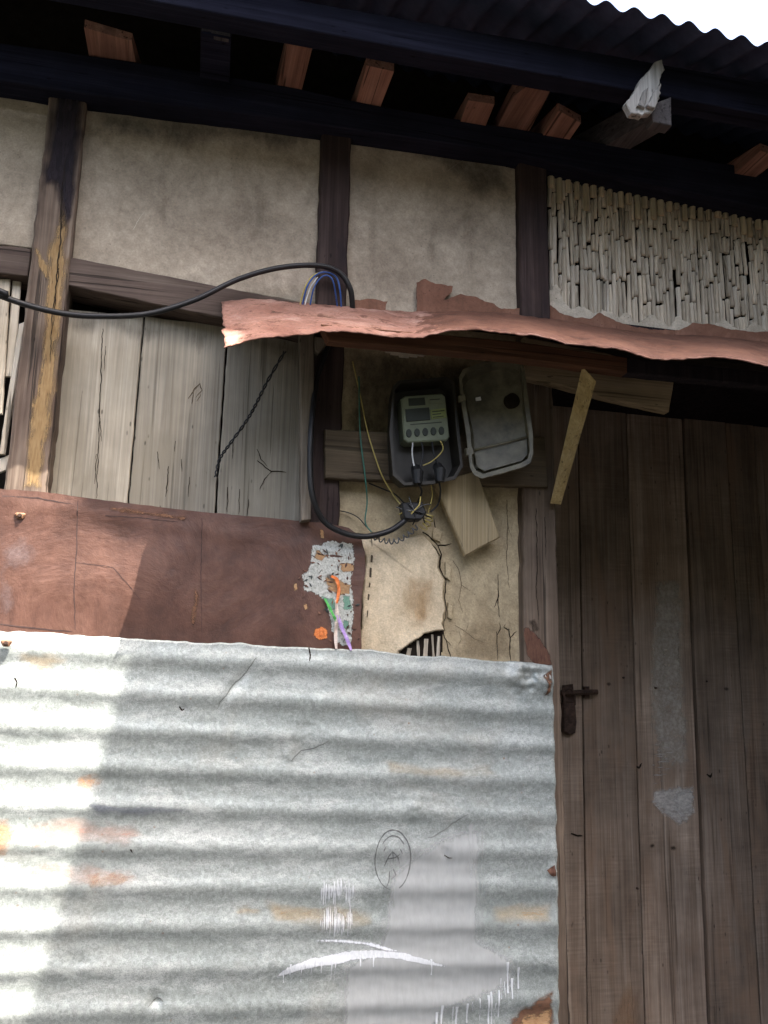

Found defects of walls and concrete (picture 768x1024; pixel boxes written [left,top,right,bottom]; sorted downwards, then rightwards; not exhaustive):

rust [314,627,328,640]
peeling [294,527,453,657]
crack [422,509,546,660]
rust [512,992,553,1024]